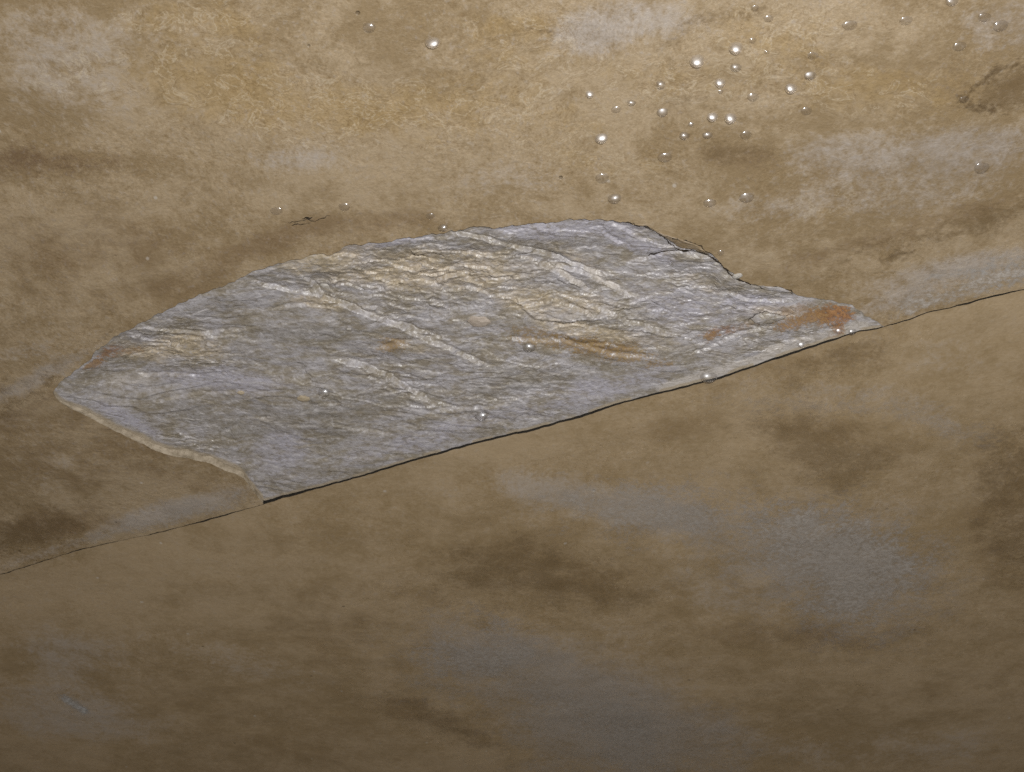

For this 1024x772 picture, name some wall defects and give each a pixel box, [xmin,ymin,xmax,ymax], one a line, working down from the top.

spalling [53,219,884,503]
corrosion [773,305,855,332]